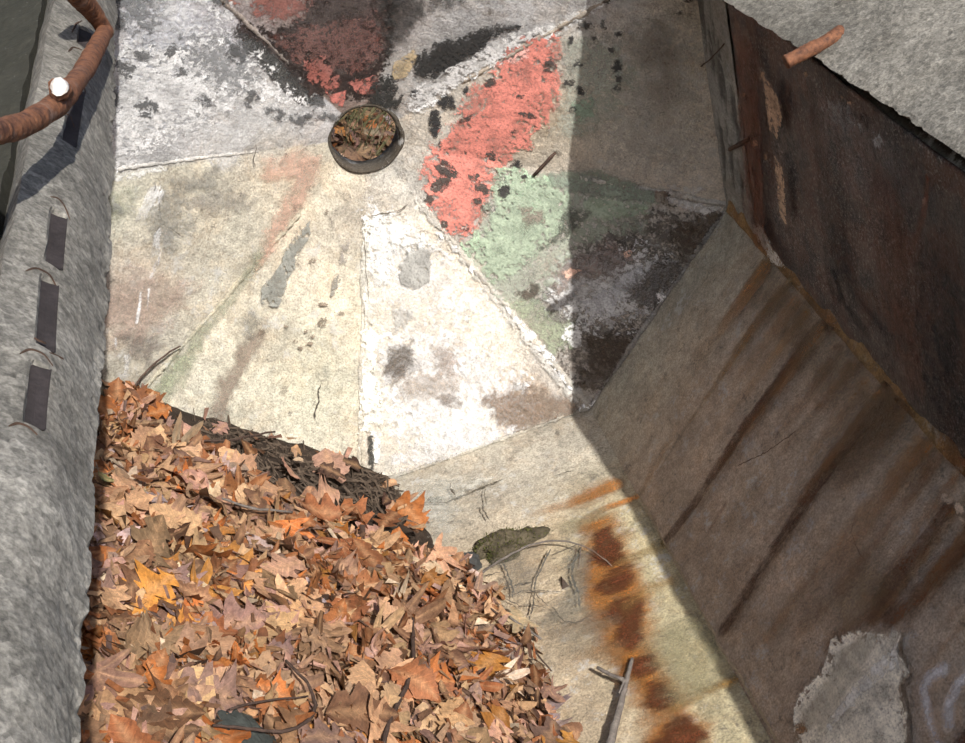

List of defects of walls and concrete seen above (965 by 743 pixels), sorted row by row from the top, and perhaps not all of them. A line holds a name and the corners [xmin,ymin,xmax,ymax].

peeling [0,0,670,411]
peeling [753,140,787,225]
peeling [759,70,782,139]
rust [578,480,709,743]
rust [690,279,792,421]
rust [661,319,834,547]
rust [719,380,909,636]
rust [848,502,965,627]